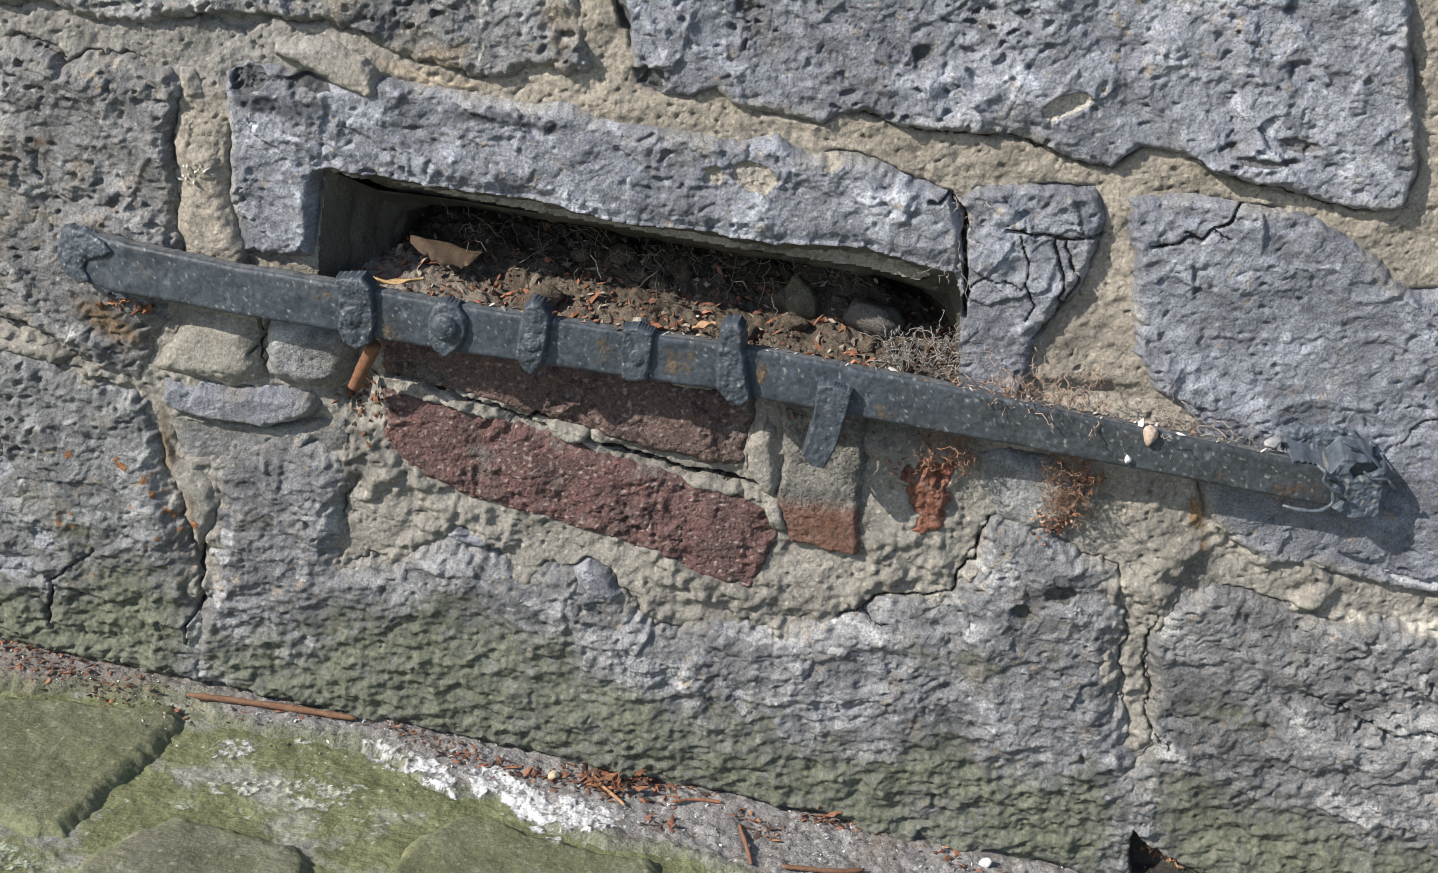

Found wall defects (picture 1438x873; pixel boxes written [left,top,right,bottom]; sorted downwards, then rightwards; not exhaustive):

crack [862,111,1135,168]
crack [1153,157,1410,247]
crack [939,189,1102,329]
crack [48,568,66,621]
crack [184,543,207,627]
crack [839,515,989,626]
water stain [212,739,255,758]
water stain [208,778,357,826]
water stain [362,739,619,842]
water stain [0,841,39,873]
spalling [1129,831,1192,873]